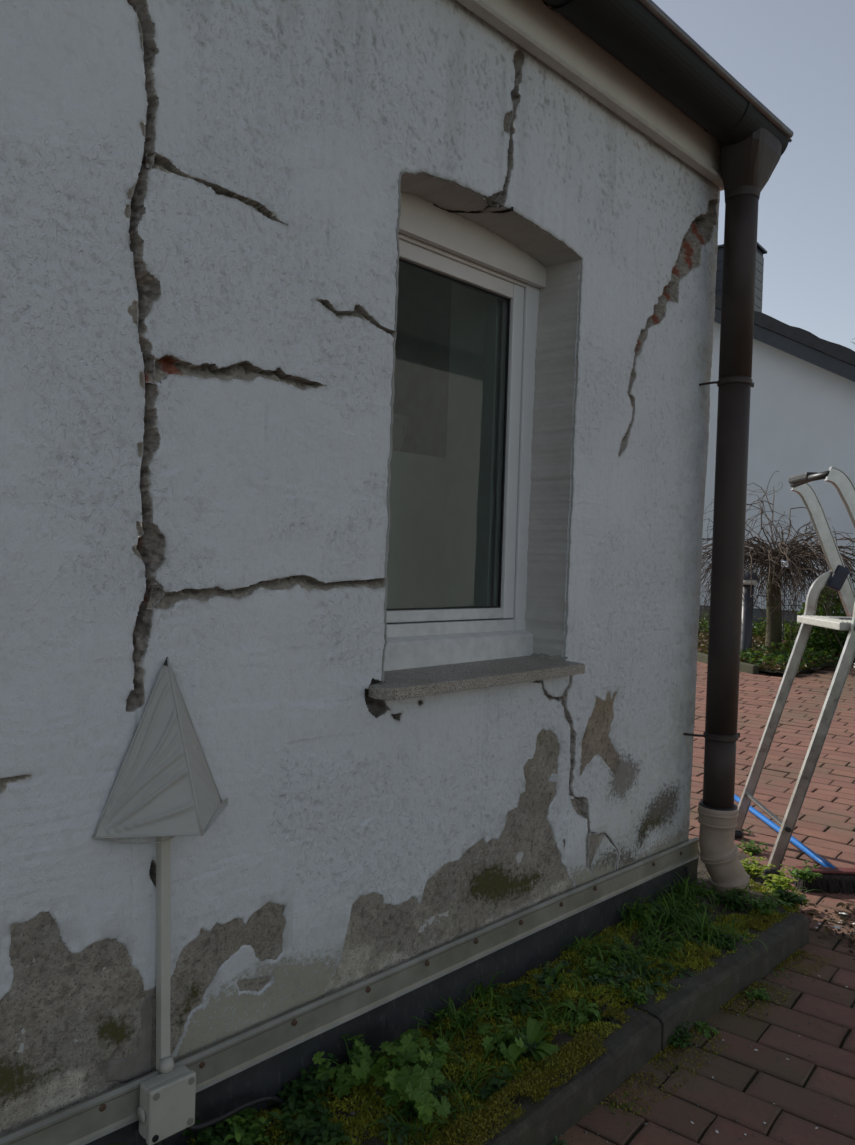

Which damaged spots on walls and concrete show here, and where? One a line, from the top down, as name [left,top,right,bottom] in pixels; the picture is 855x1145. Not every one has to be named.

crack [433,49,525,213]
crack [124,0,396,712]
crack [619,198,717,457]
crack [0,774,32,794]
flaking render [365,678,402,721]
peeling [325,729,574,996]
peeling [580,692,620,776]
peeling [0,912,156,1136]
peeling [170,902,286,1055]